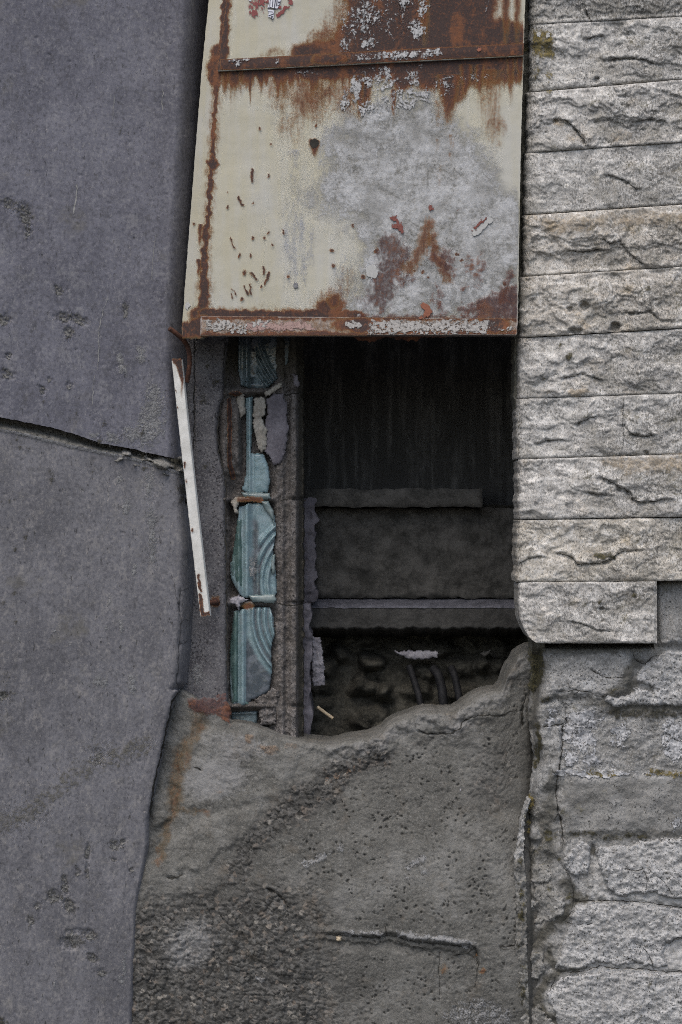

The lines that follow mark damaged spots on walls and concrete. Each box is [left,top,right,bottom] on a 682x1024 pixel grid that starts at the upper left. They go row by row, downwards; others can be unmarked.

peeling [339,0,489,118]
corrosion [182,0,524,338]
corrosion [170,694,231,814]
crack [418,653,682,925]
crack [326,926,515,995]